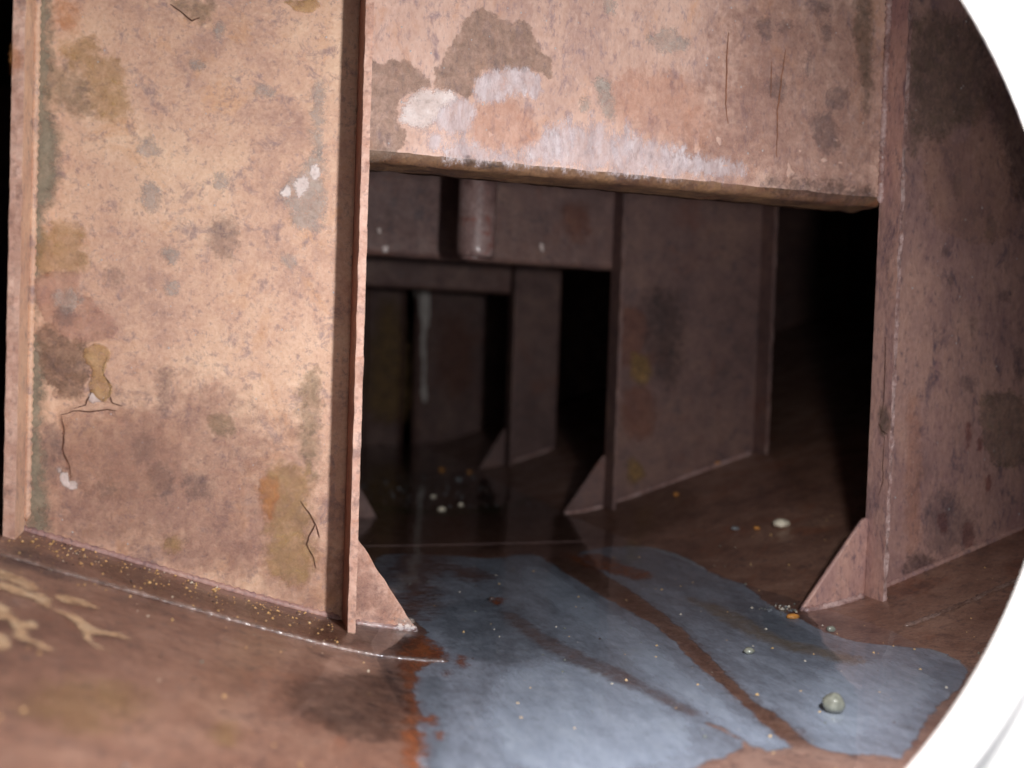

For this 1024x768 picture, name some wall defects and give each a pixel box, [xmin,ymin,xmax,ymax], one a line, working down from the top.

leakage [372,14,747,179]
peeling [38,326,112,403]
crack [61,358,122,475]
crack [300,501,320,568]
corrosion [397,636,465,767]